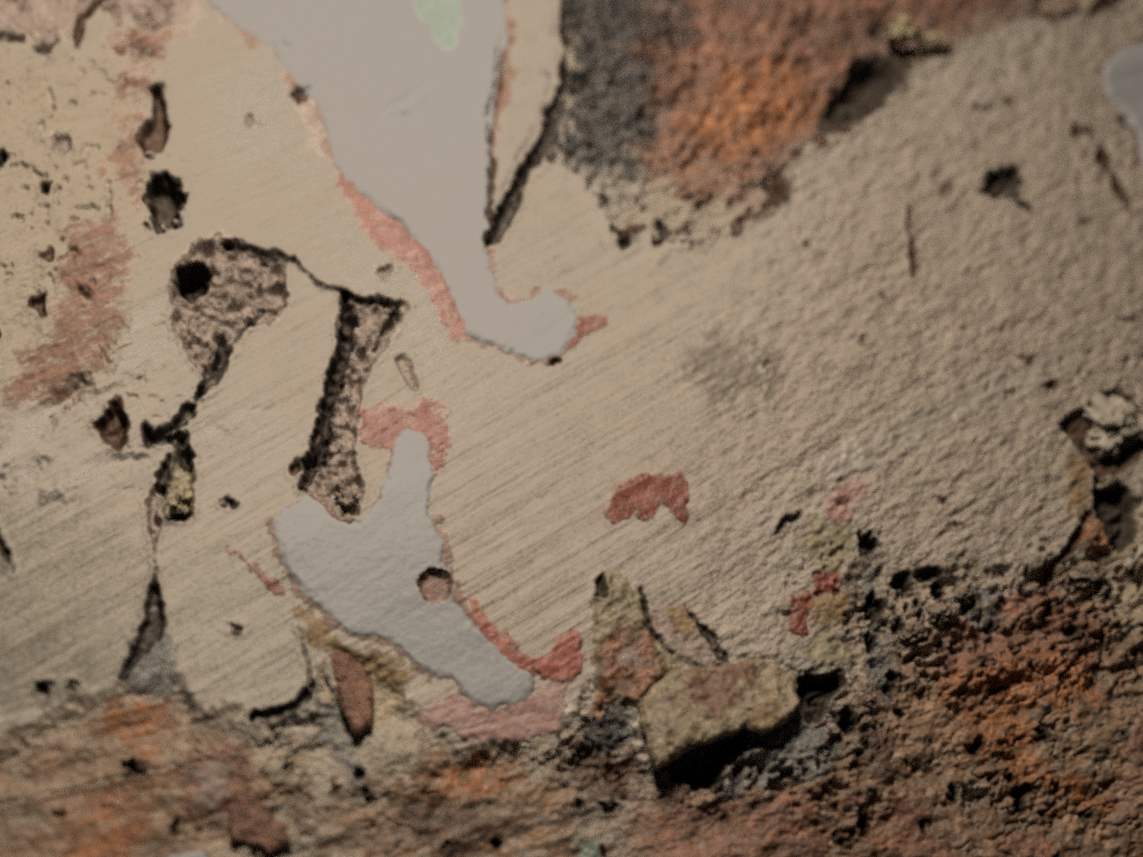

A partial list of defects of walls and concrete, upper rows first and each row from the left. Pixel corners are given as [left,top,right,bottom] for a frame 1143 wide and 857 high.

spalling [27,292,46,316]
spalling [38,246,54,262]
spalling [136,84,172,154]
spalling [141,171,189,234]
peeling [207,0,607,366]
crack [484,0,574,247]
corrosion [546,0,1123,247]
crack [90,393,202,681]
peeling [166,232,584,744]
corrosion [0,495,1143,857]
peeling [637,658,800,770]
hole [834,707,856,735]